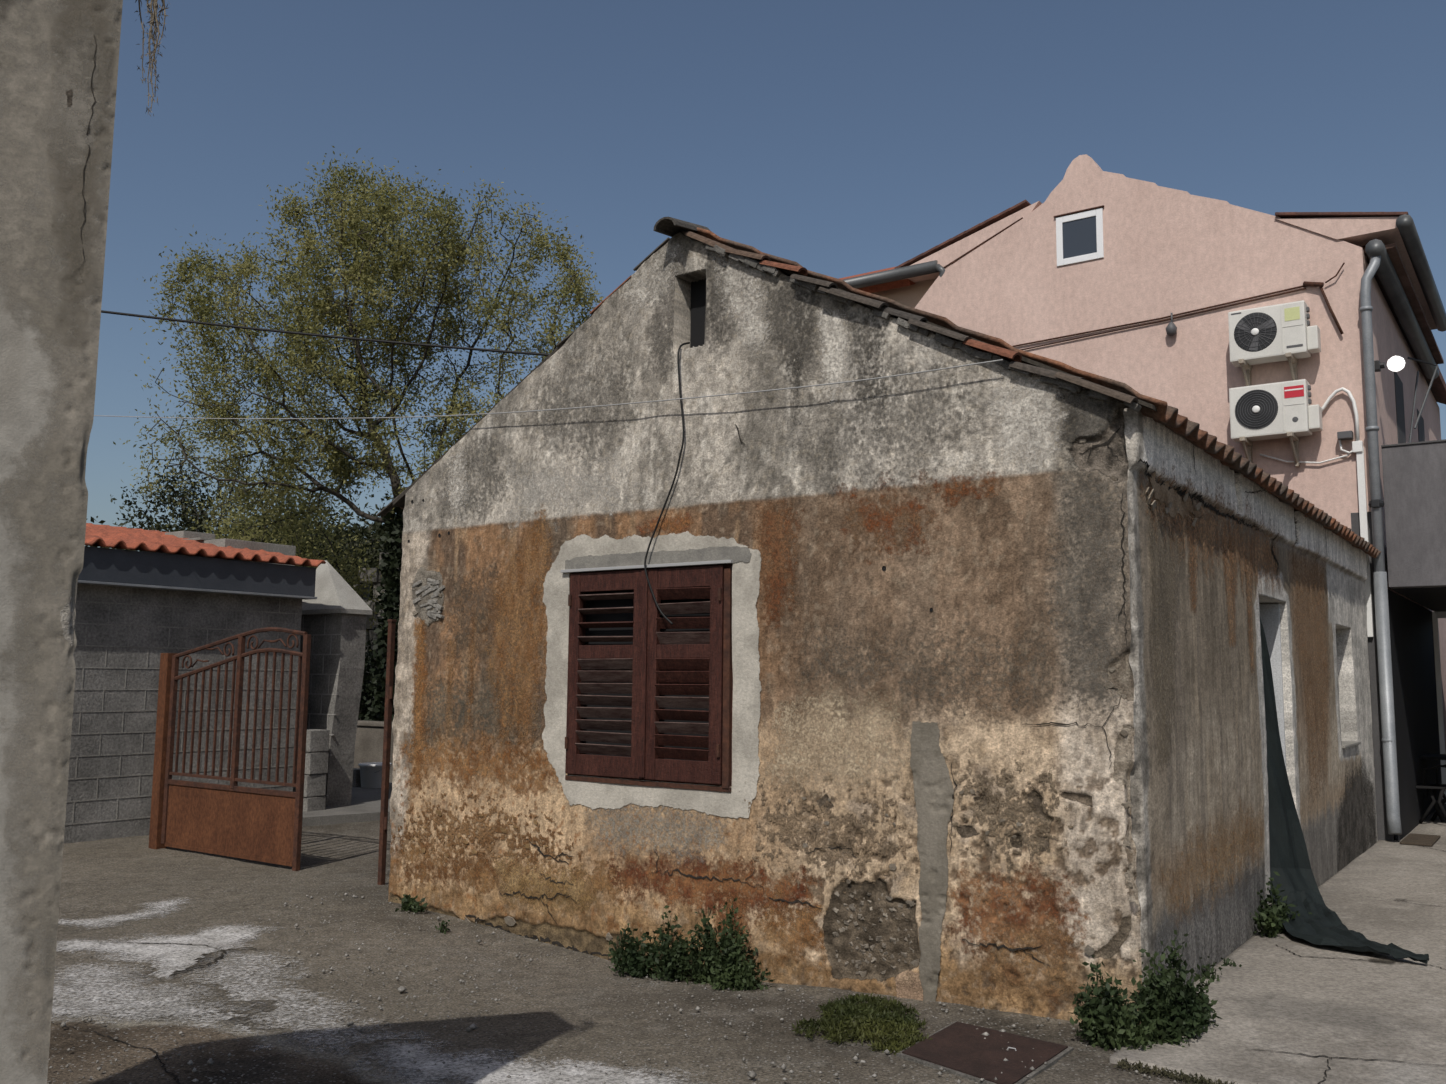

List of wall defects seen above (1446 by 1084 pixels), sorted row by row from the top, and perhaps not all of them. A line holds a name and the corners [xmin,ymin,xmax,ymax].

crack [79,36,97,280]
leakage [624,244,680,379]
leakage [0,0,123,1071]
spalling [410,578,445,619]
leakage [424,562,543,751]
leakage [437,347,637,526]
leakage [703,249,1130,805]
spalling [737,776,924,1001]
peeling [944,749,1093,892]
spalling [1113,726,1141,918]
leakage [1156,866,1266,985]
leakage [1338,762,1377,871]